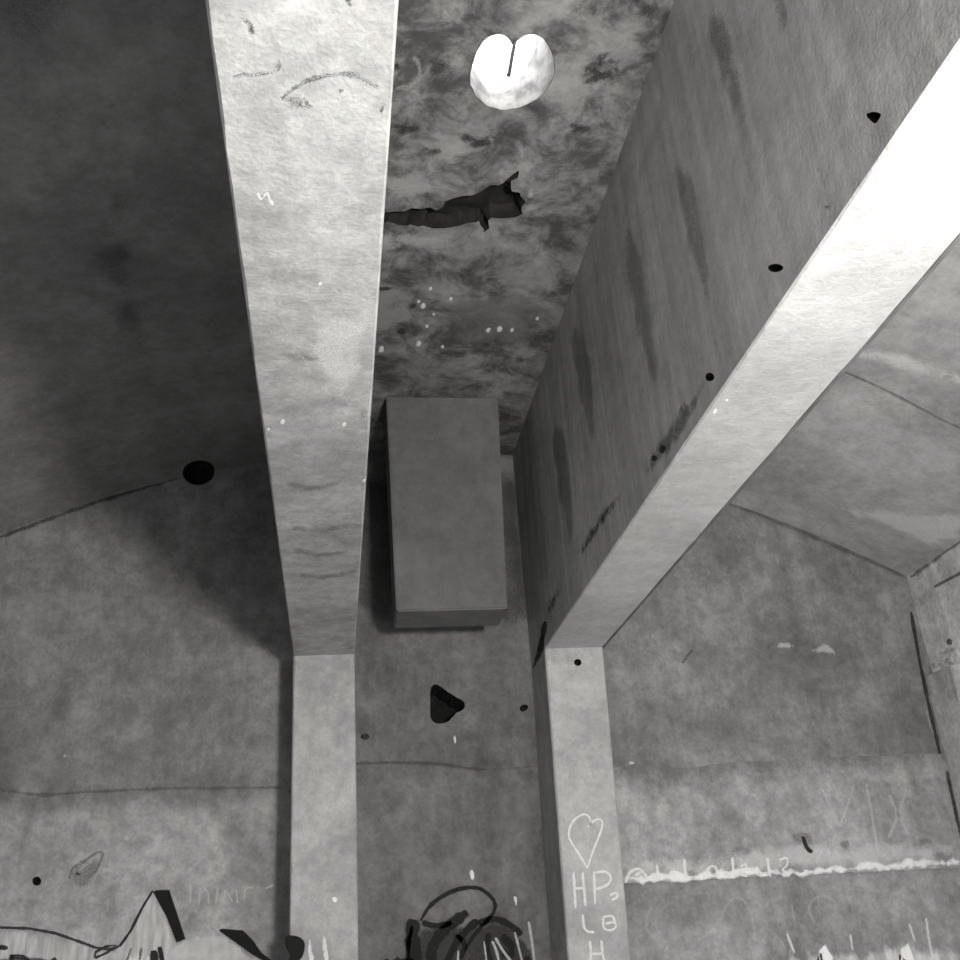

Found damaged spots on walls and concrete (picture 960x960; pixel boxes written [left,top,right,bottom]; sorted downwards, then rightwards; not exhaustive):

crack [852,374,960,429]